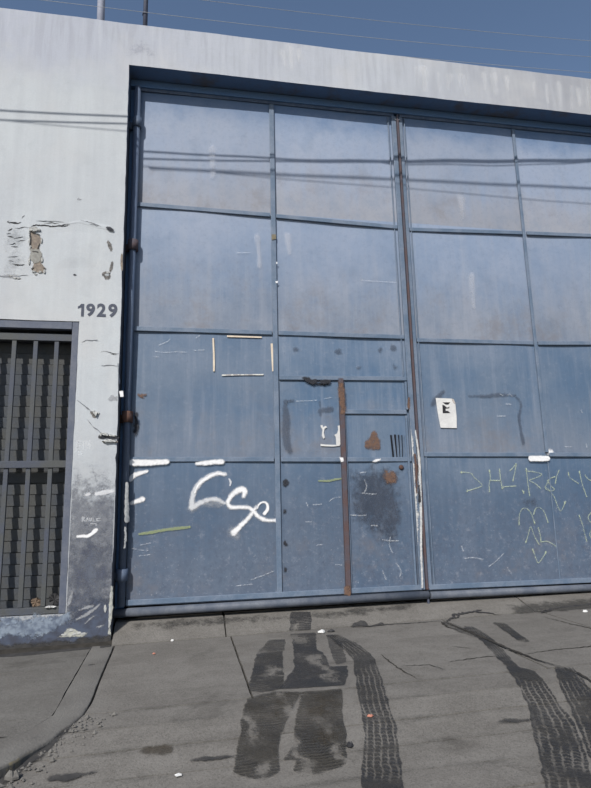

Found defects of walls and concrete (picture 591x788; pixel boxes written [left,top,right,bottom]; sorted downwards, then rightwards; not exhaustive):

flaking render [28,226,46,275]
peeling [102,254,123,280]
corrosion [338,382,346,414]
corrosion [365,431,380,450]
damp [353,470,399,538]